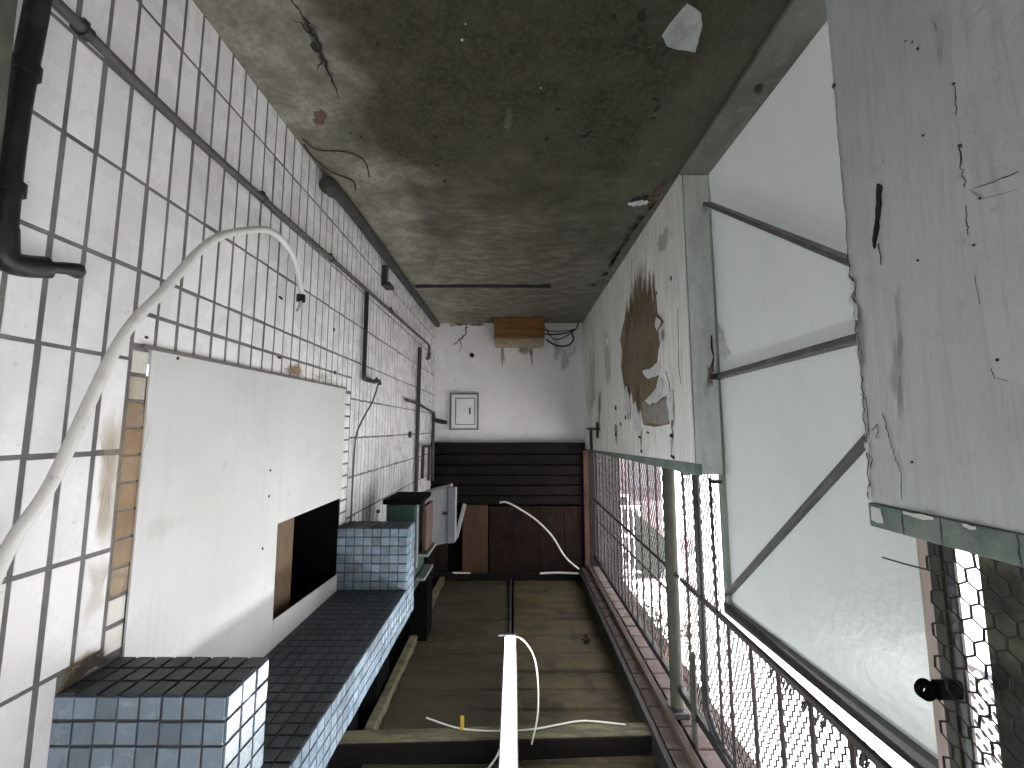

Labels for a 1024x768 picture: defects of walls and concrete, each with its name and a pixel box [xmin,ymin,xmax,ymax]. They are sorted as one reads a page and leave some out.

crack [291,0,339,98]
rust [313,110,326,124]
peeling [620,265,674,432]
crack [833,87,904,534]
peeling [871,507,884,523]
peeling [902,511,934,520]